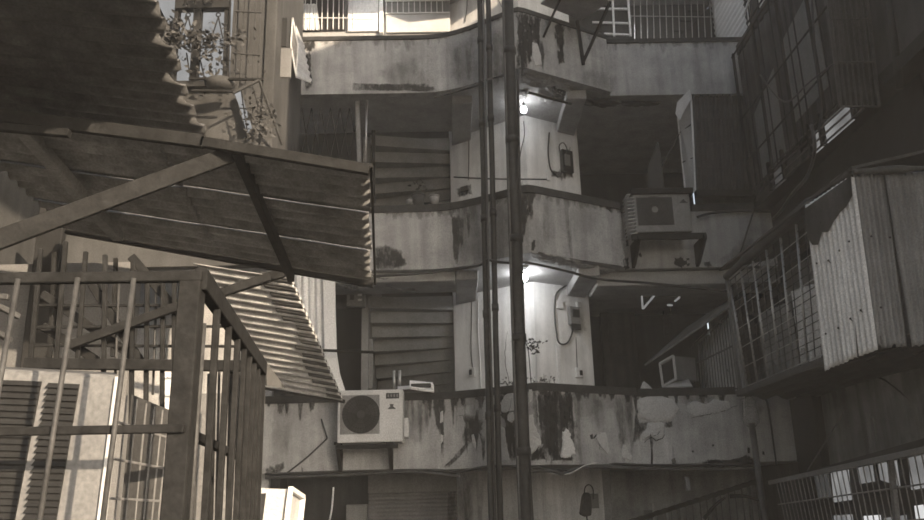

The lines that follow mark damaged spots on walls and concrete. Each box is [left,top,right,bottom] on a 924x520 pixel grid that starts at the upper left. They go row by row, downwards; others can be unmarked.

water stain [516,13,545,76]
water stain [554,24,565,64]
water stain [422,396,485,467]
water stain [500,394,516,458]
peeling [560,429,576,458]
water stain [531,391,646,463]